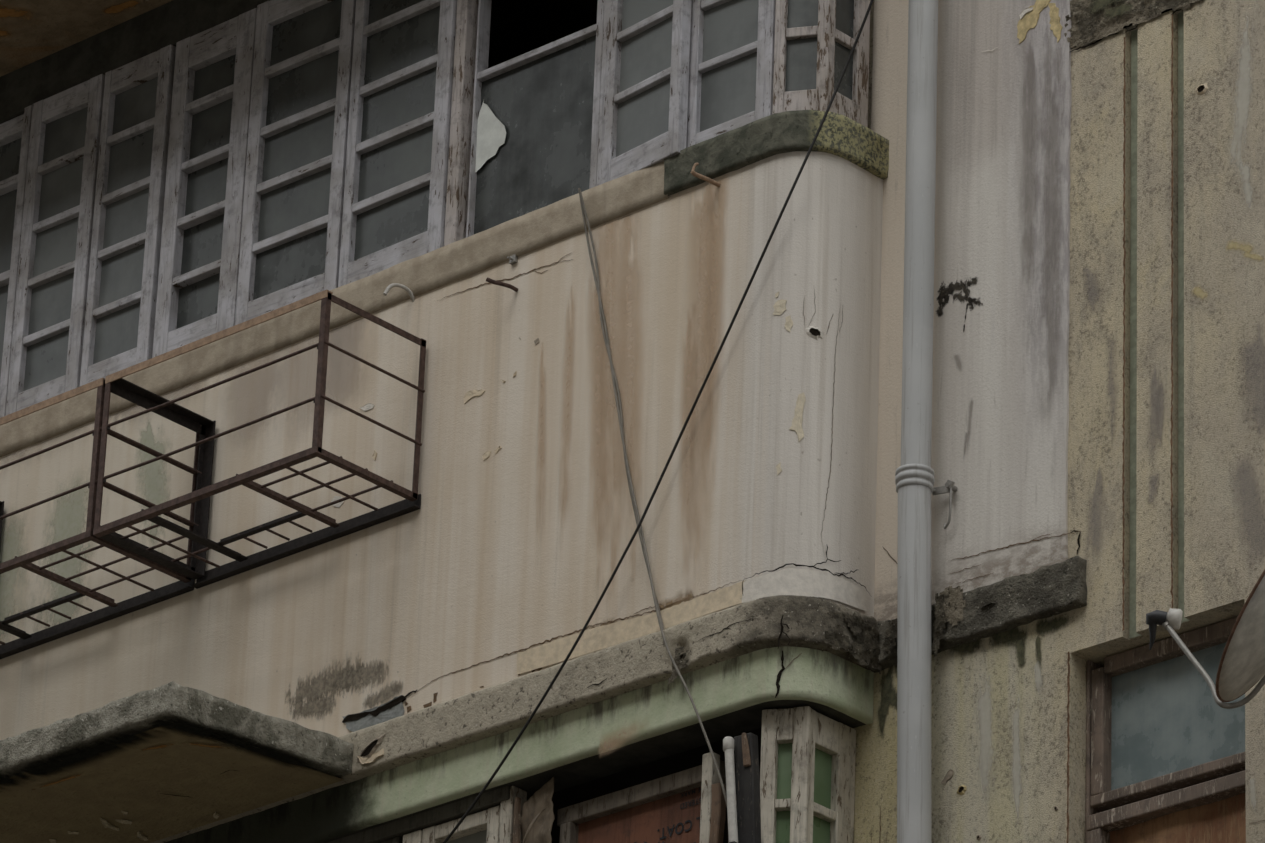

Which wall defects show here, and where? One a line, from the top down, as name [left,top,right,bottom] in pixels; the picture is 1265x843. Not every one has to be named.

water stain [936,277,983,333]
spalling [1017,0,1199,631]
crack [404,290,871,698]
spalling [931,585,966,657]
water stain [287,661,402,718]